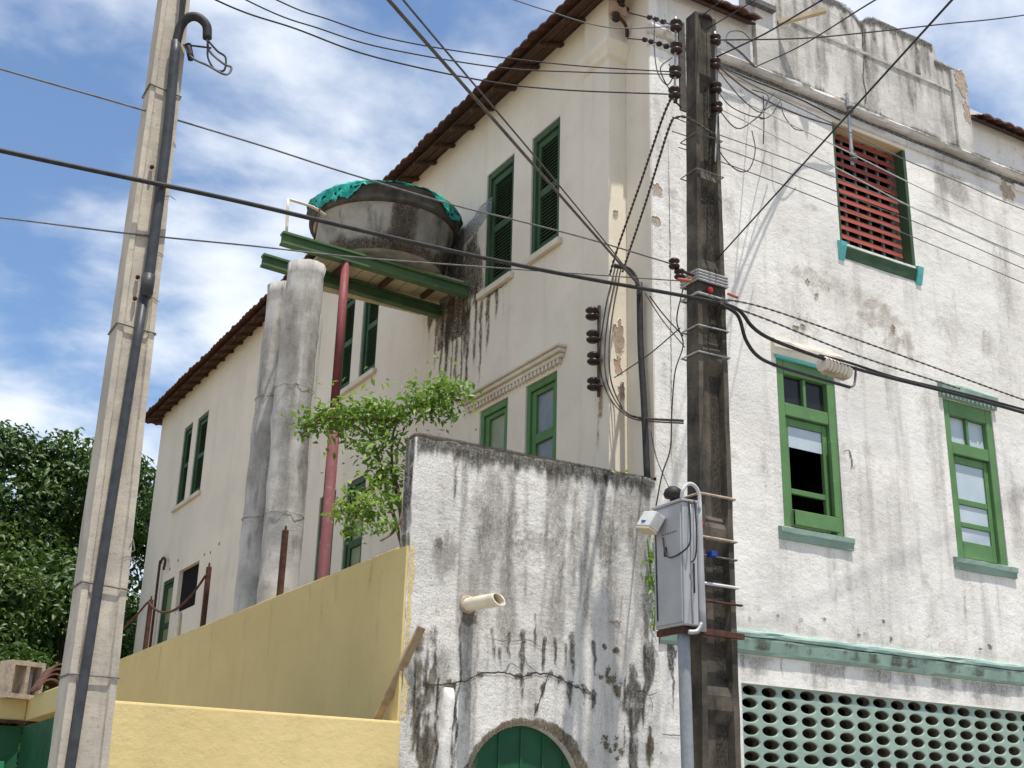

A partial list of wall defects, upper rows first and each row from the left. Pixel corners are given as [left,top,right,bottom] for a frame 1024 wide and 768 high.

damp [721,0,1024,187]
flaking render [953,68,971,124]
damp [330,203,504,387]
peeling [612,318,625,402]
damp [401,433,655,564]
damp [479,505,575,686]
damp [407,608,477,768]
crack [421,637,596,715]
damp [465,717,587,768]
damp [592,604,655,768]
damp [667,644,677,703]